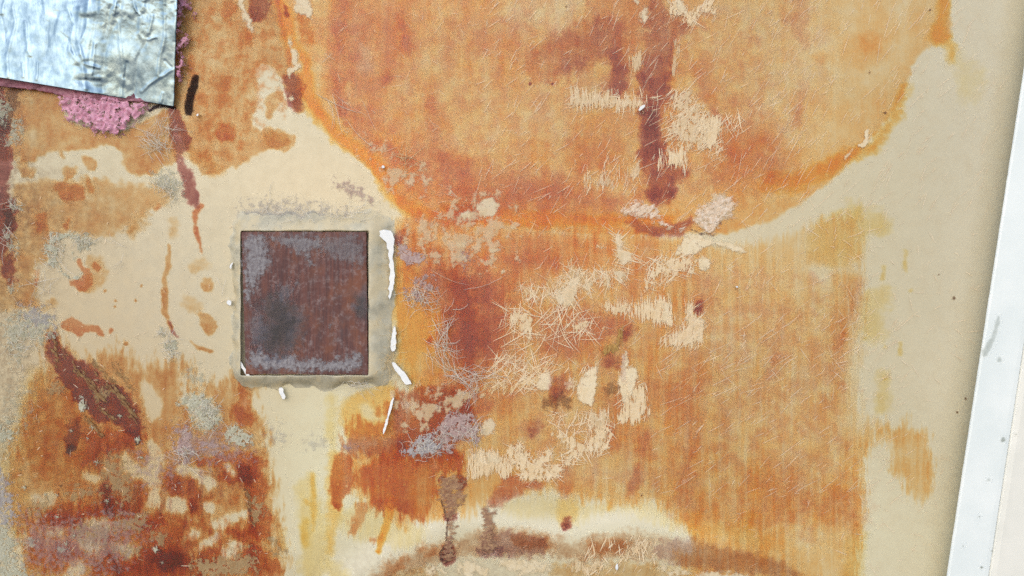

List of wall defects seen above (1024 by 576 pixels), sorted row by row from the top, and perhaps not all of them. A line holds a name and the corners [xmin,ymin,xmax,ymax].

corrosion [0,89,17,277]
spalling [618,194,736,235]
peeling [379,230,395,299]
peeling [390,326,411,385]